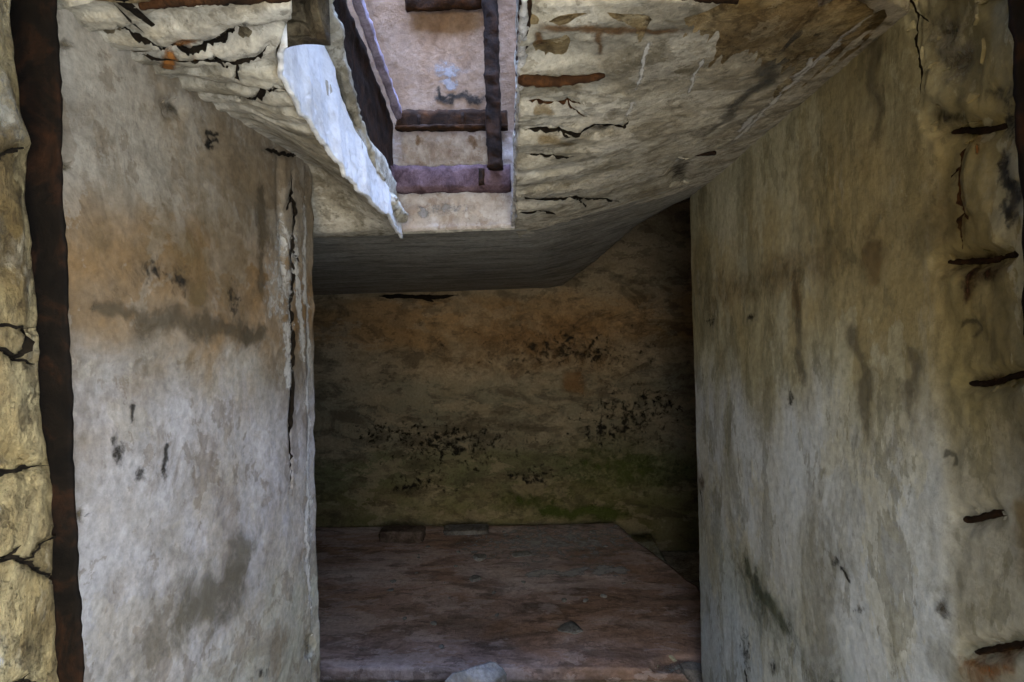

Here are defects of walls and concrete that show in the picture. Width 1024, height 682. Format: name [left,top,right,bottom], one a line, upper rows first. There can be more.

spalling [138,0,292,10]
spalling [325,0,409,223]
spalling [510,0,605,227]
crack [526,98,629,159]
spalling [674,150,716,184]
corrosion [964,265,1001,302]
crack [0,323,41,365]
water stain [476,326,628,373]
water stain [567,391,681,452]
crack [0,464,47,477]
water stain [356,411,524,491]
crack [0,535,56,576]